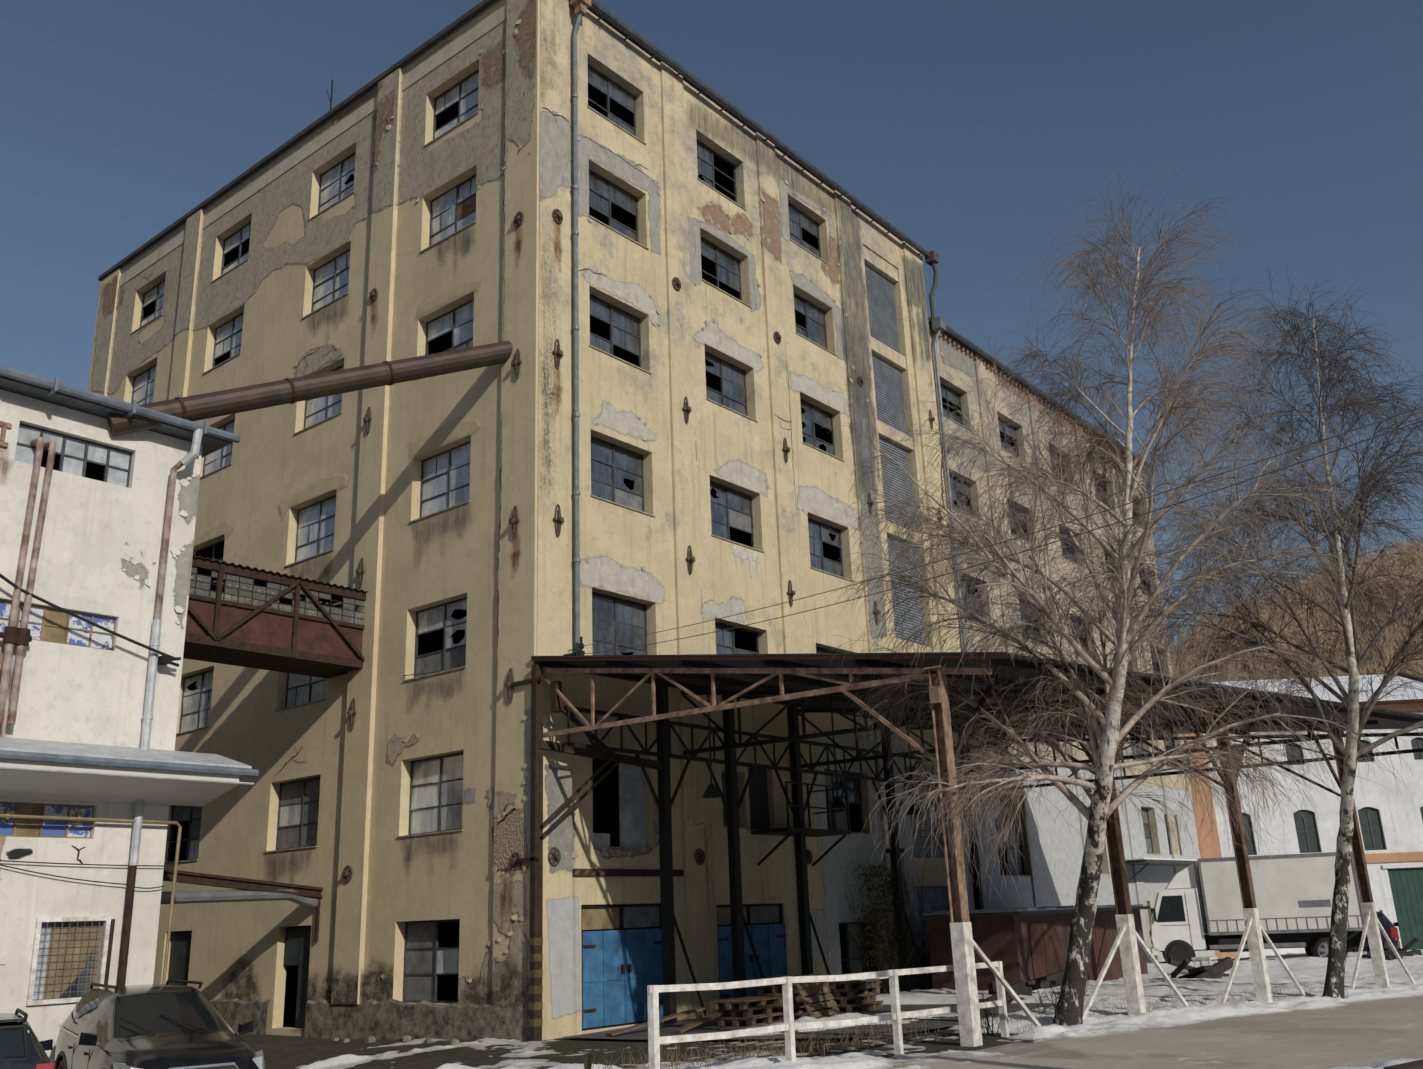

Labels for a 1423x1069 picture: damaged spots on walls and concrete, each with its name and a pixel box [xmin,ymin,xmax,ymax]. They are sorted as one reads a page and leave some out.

flaking render [91,0,536,395]
flaking render [688,191,782,262]
flaking render [178,472,200,524]
flaking render [121,542,156,589]
flaking render [170,540,194,630]
flaking render [386,733,419,767]
spalling [0,836,33,859]
flaking render [458,709,659,1008]
damp [307,967,393,1004]
damp [465,963,529,1008]